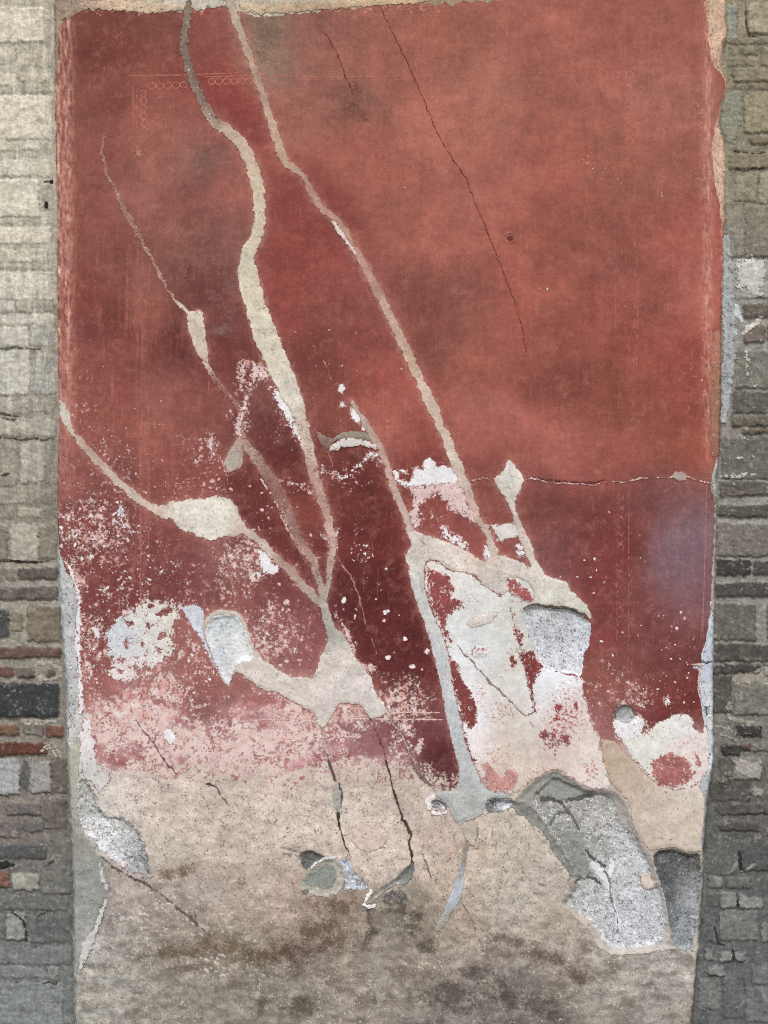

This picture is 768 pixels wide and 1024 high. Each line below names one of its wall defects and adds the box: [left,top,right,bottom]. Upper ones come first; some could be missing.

flaking render [43,0,363,208]
crack [380,7,527,352]
crack [0,0,499,654]
peeling [234,360,301,442]
peeling [331,384,365,432]
peeling [322,452,382,479]
peeling [392,457,476,528]
crack [526,471,712,486]
crack [322,728,363,879]
flaking render [20,500,704,1024]
crack [369,707,432,878]
peeling [612,591,755,798]